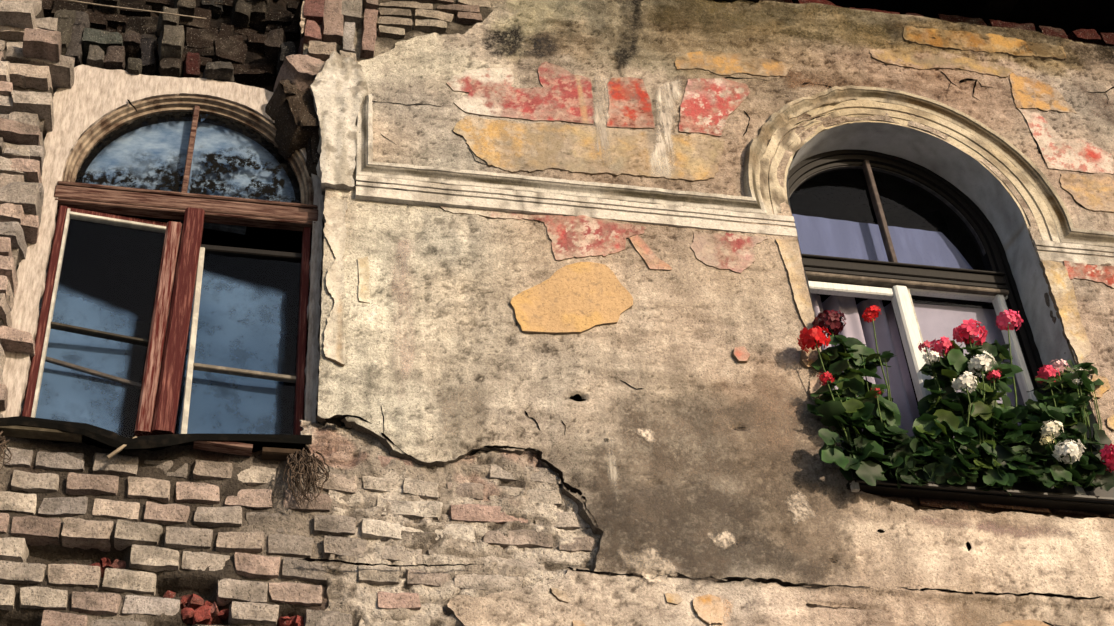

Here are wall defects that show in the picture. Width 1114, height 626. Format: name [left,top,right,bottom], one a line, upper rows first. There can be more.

flaking render [292,0,507,62]
peeling [869,26,1114,213]
flaking render [0,0,75,418]
peeling [322,197,370,367]
peeling [439,206,672,335]
peeling [1039,260,1114,402]
flaking render [0,420,600,626]
crack [330,406,419,462]
crack [470,410,598,527]
crack [565,567,870,610]
water stain [592,382,854,584]
flaking render [873,494,1114,519]